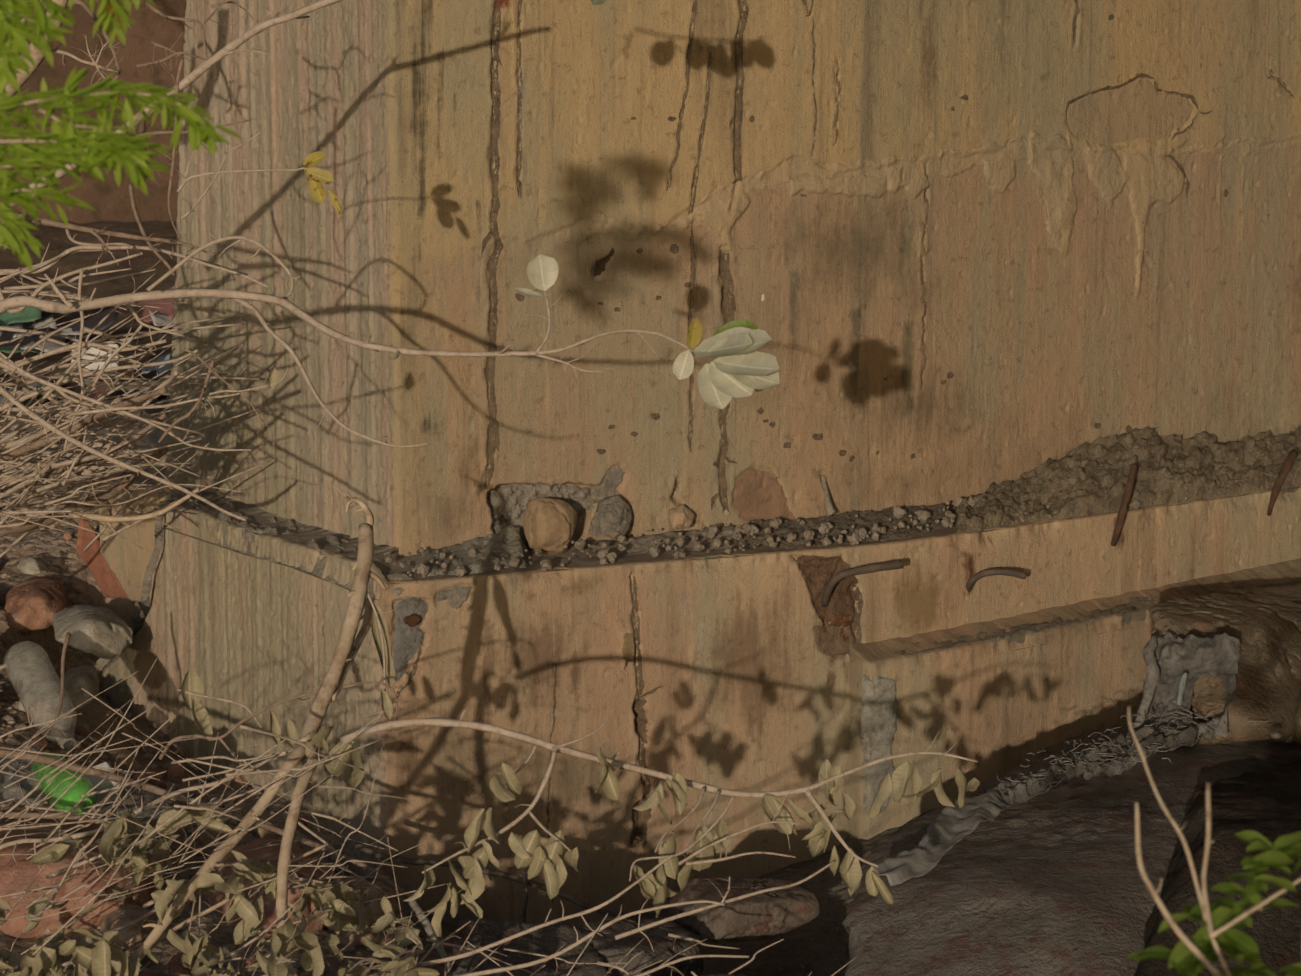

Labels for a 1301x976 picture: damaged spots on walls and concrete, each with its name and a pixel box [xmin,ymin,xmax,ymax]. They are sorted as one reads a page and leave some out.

crack [481,0,523,489]
crack [667,0,749,512]
spalling [76,449,796,706]
crack [624,576,662,849]
spalling [1111,463,1138,546]
spalling [1267,450,1298,516]